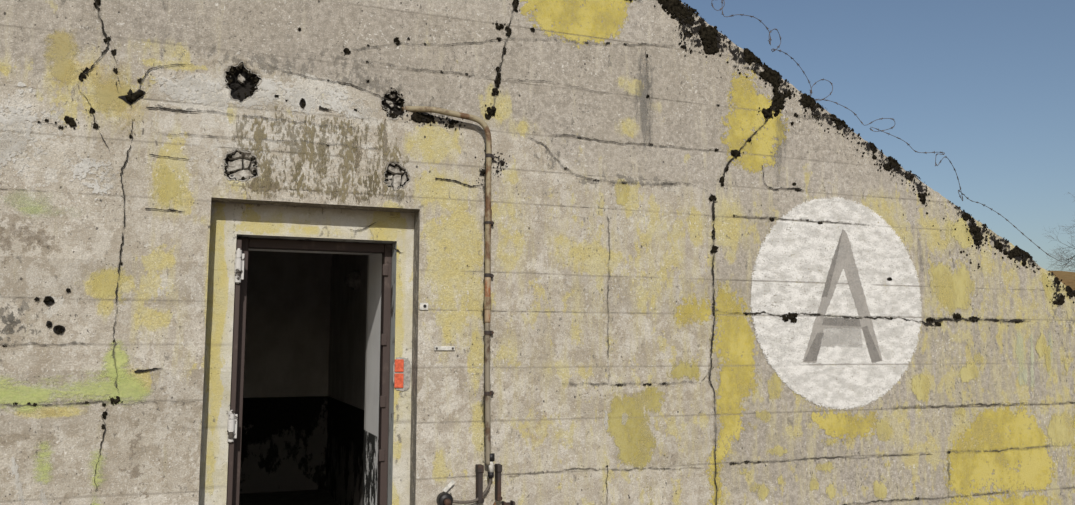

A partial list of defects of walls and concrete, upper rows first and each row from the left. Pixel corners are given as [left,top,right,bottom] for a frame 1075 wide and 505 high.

peeling [151,61,414,208]
crack [572,40,687,115]
crack [2,0,607,490]
crack [525,106,1023,413]
crack [509,461,681,495]
crack [714,441,1049,505]